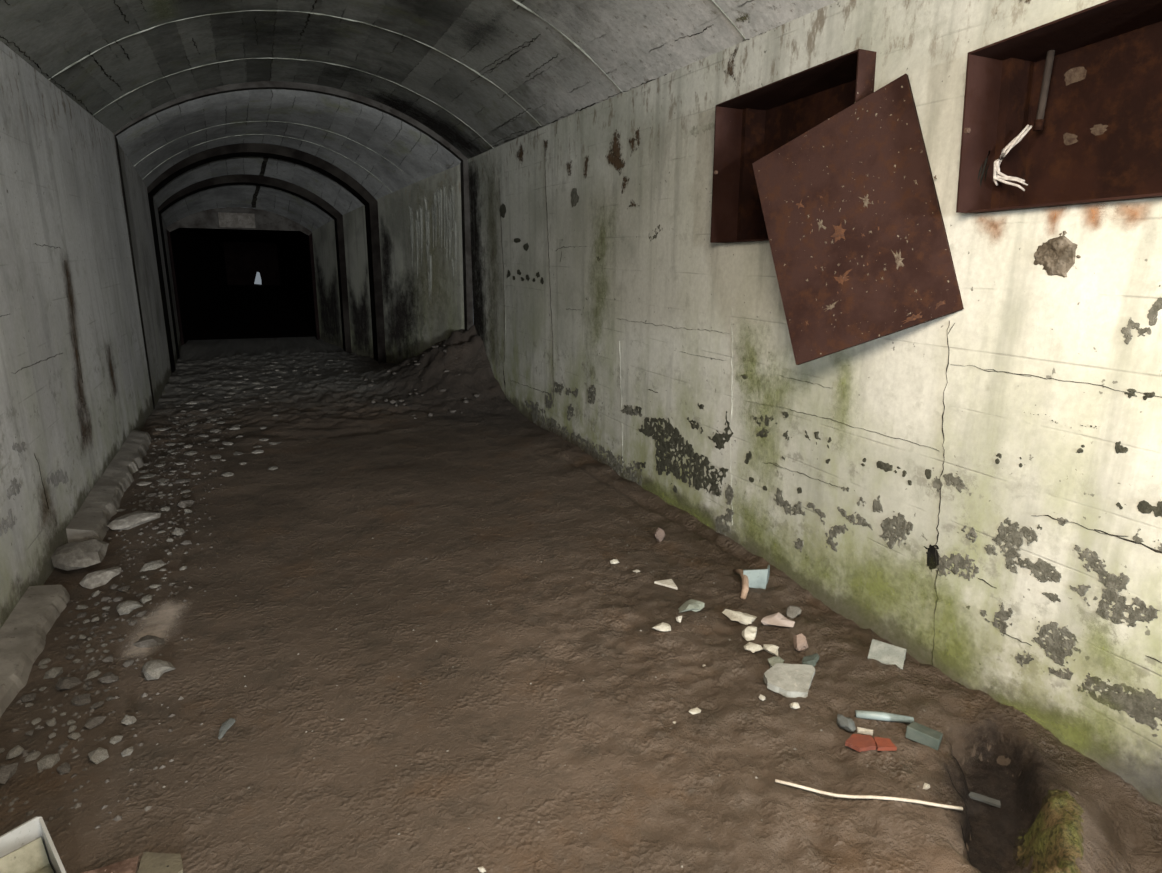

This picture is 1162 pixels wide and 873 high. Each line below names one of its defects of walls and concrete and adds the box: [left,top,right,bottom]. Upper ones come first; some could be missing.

crack [0,36,100,122]
rust [796,195,846,244]
rust [1049,208,1063,229]
rust [1088,203,1101,226]
rust [861,227,908,280]
spalling [1034,231,1081,277]
rust [806,256,852,321]
peeling [525,382,734,536]
crack [756,321,1162,665]
peeling [924,517,1160,628]
peeling [1015,617,1162,737]